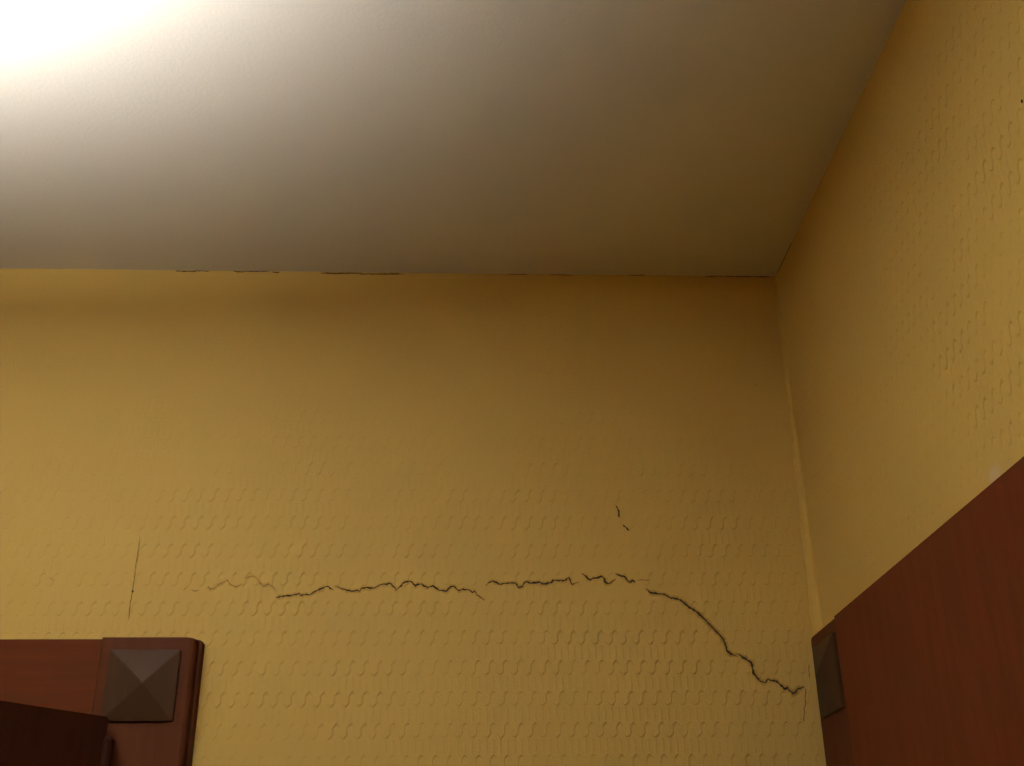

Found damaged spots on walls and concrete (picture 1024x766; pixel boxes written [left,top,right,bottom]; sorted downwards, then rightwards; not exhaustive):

crack [128,539,140,621]
crack [183,572,805,697]